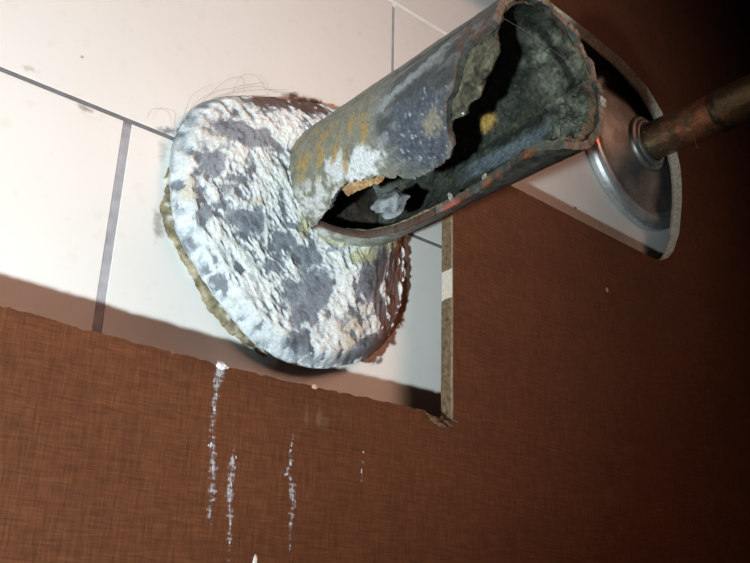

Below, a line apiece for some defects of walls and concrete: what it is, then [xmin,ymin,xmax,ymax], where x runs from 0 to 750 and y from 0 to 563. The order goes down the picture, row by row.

leakage [212,361,226,414]
leakage [227,456,237,544]